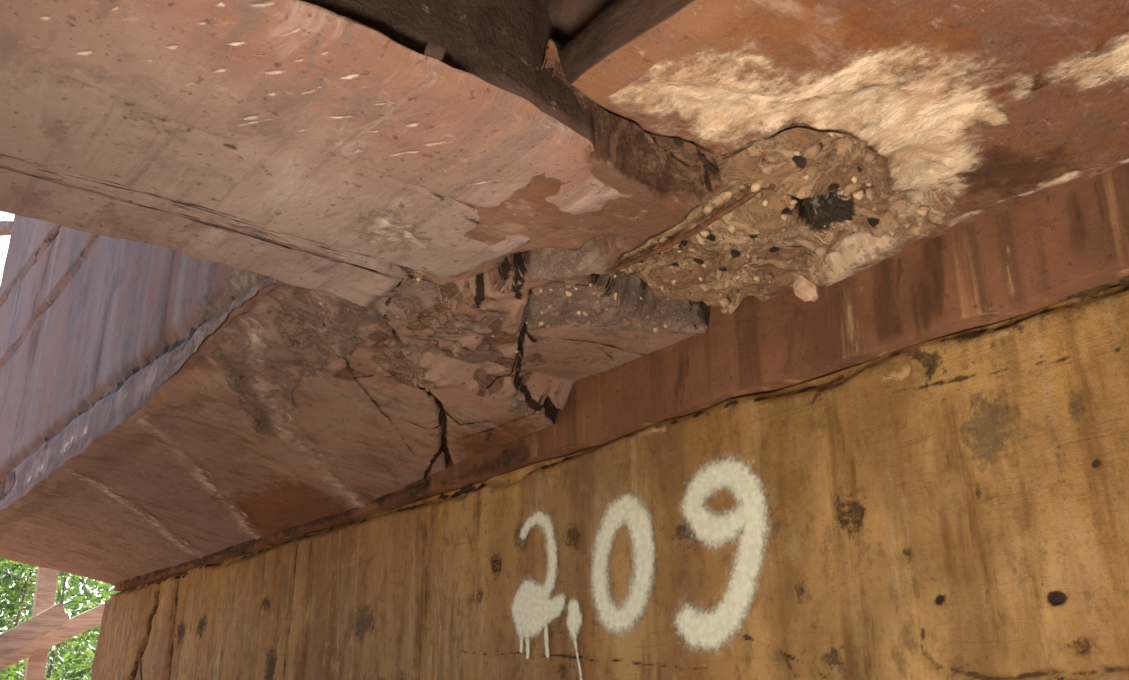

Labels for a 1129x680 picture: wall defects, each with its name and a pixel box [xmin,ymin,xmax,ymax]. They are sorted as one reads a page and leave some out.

damp [1022,171,1079,195]
spalling [356,210,432,251]
spalling [370,47,1007,413]
spalling [0,316,215,499]
spalling [272,283,364,380]
crack [336,251,647,479]
spalling [624,411,709,437]
spalling [890,276,1129,388]
spalling [326,483,487,533]
crack [131,592,160,680]
crack [921,629,1121,680]